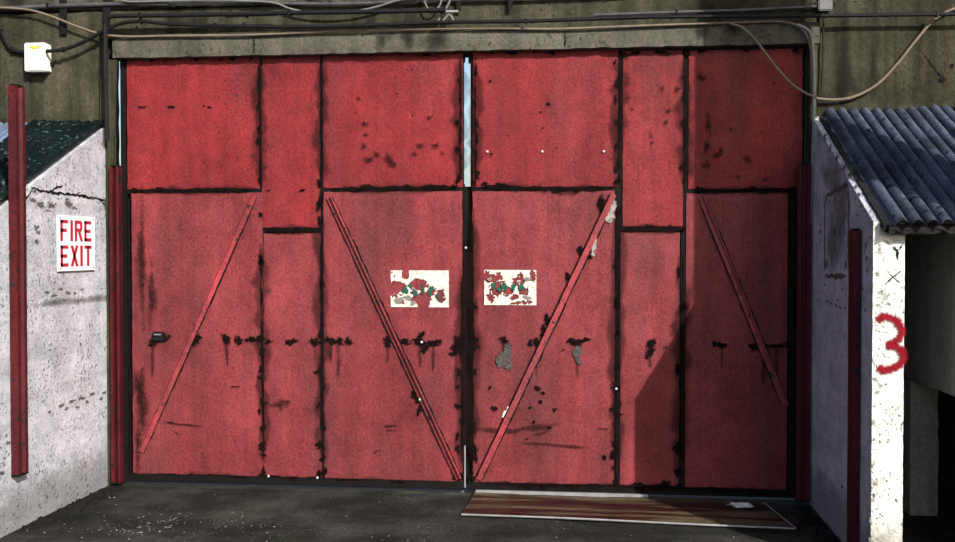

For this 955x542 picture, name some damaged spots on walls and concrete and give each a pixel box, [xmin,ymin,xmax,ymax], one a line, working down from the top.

crack [26,186,106,206]